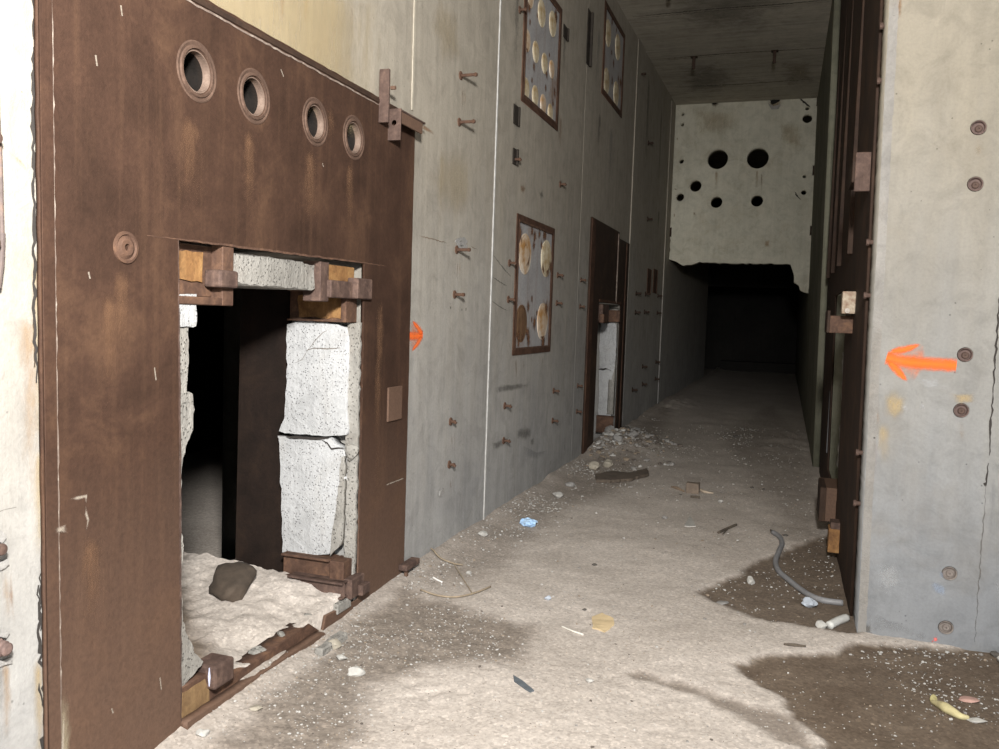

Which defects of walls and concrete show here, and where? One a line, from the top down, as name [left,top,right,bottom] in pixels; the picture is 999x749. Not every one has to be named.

corrosion [209,0,341,71]
crack [974,298,999,642]